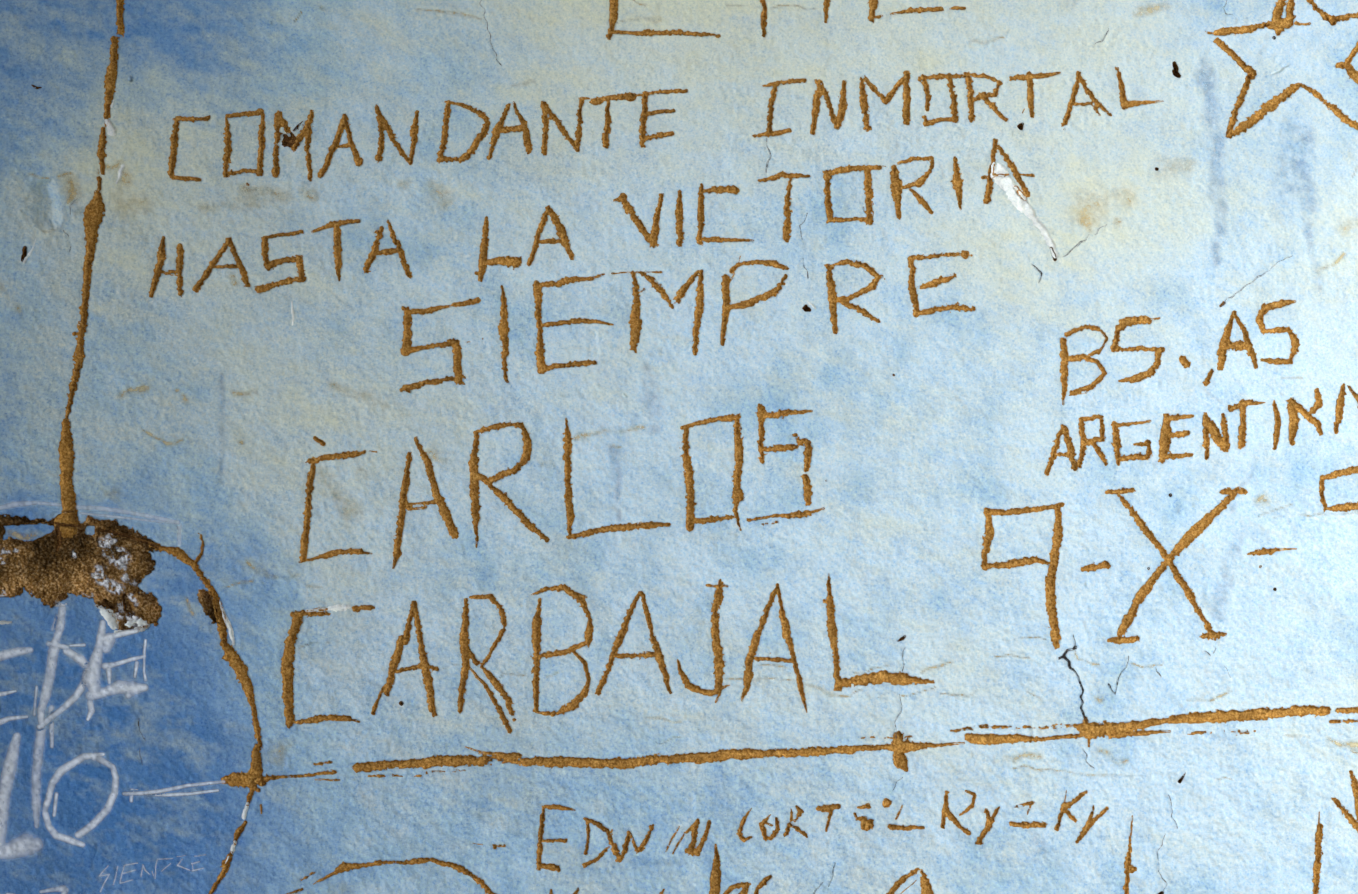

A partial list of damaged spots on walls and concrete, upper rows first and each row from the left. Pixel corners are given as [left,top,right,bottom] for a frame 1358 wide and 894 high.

spalling [0,510,162,634]
crack [1058,635,1161,768]